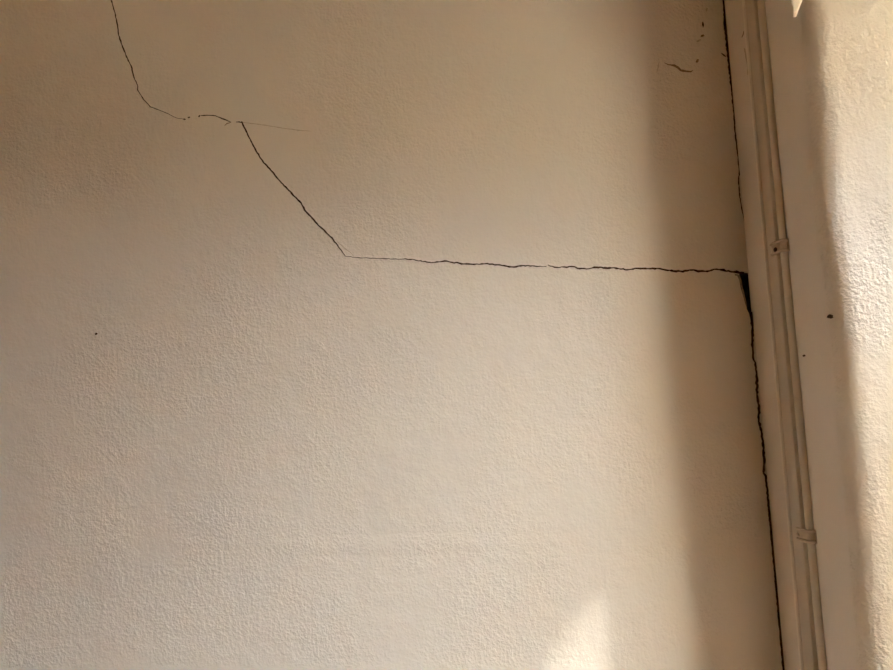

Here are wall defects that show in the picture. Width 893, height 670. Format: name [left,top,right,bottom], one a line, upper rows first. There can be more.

crack [110,0,748,274]
crack [749,312,785,670]